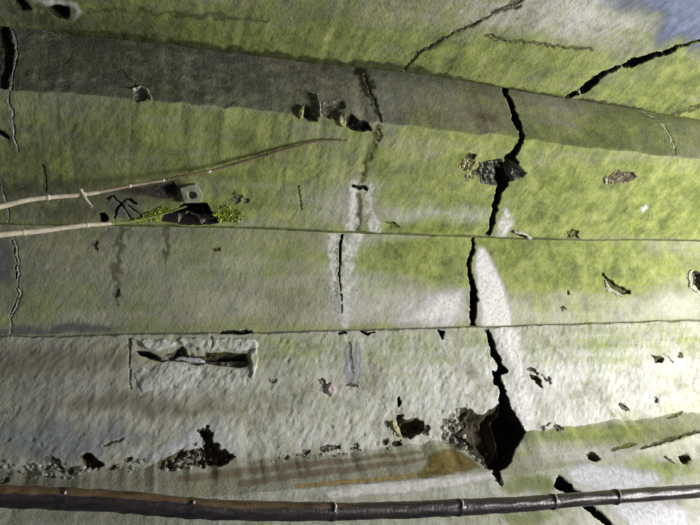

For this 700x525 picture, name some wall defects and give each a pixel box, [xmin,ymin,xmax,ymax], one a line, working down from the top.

crack [404,0,594,71]
crack [565,39,700,98]
spalling [297,93,372,132]
spalling [459,153,527,185]
crack [327,67,383,336]
crack [466,87,524,407]
water stain [498,208,513,237]
water stain [475,247,538,431]
spalling [1,425,236,484]
spalling [383,397,431,450]
spalling [441,398,526,474]
crack [554,476,611,525]